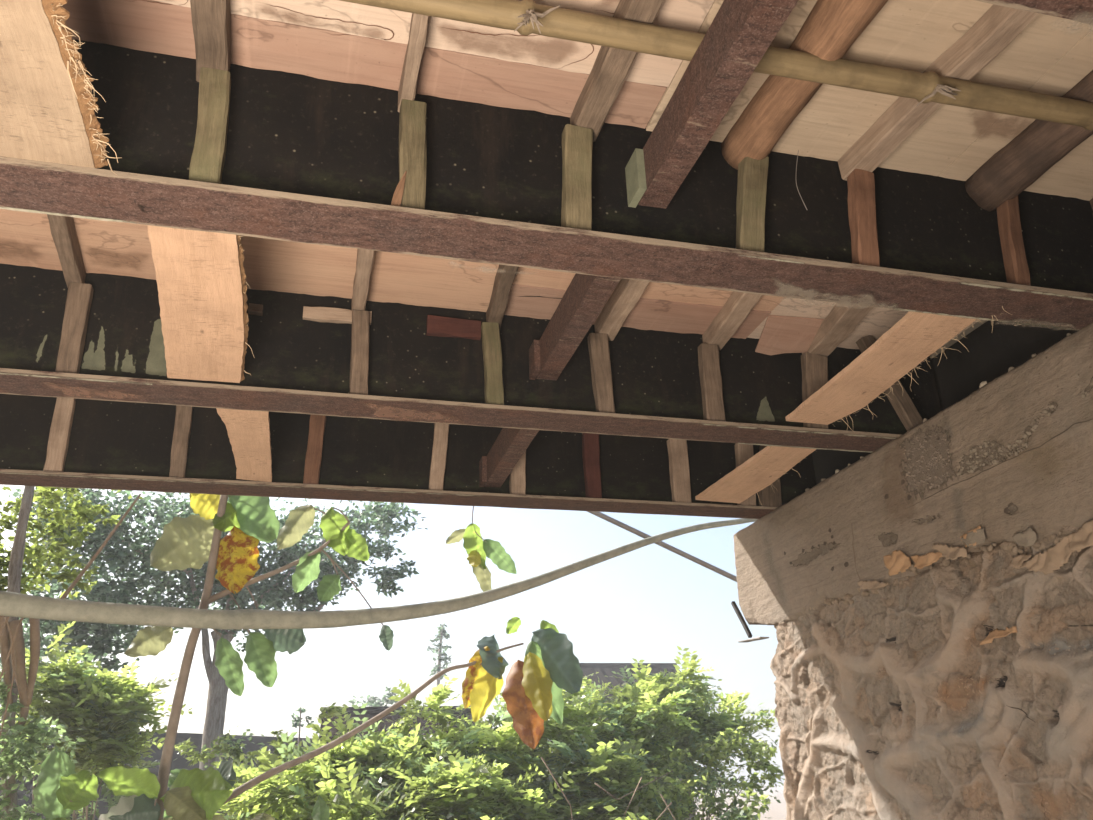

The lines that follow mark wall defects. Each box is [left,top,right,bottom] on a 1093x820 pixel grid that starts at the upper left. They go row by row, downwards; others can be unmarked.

crack [852,411,1093,581]
spalling [961,526,1073,559]